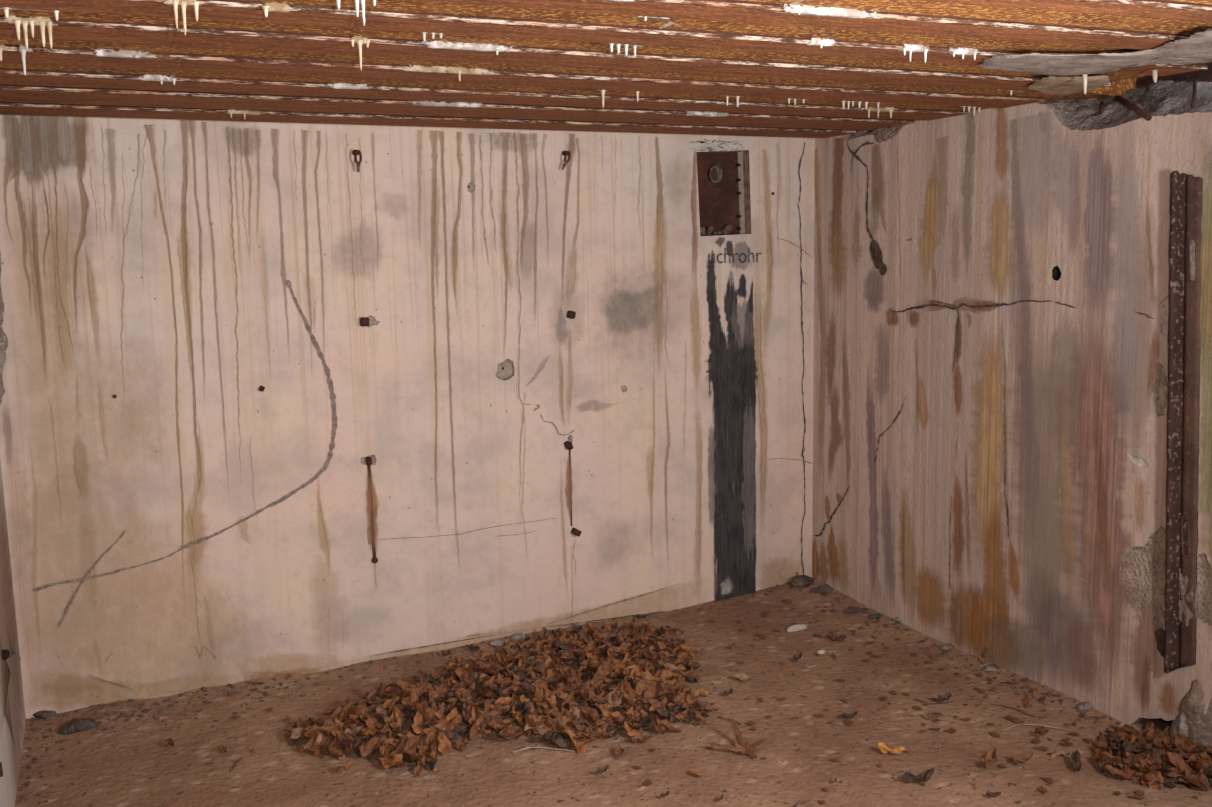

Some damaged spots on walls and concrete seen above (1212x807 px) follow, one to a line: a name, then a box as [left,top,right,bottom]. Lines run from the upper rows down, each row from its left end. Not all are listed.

damp [0,7,59,75]
damp [327,0,376,90]
damp [419,32,512,55]
damp [775,0,880,19]
spalling [1099,95,1152,121]
spalling [1136,62,1212,108]
crack [847,141,912,276]
spalling [0,252,8,404]
crack [893,300,1076,371]
crack [875,395,907,462]
corrosion [367,478,377,544]
spalling [1120,526,1166,634]